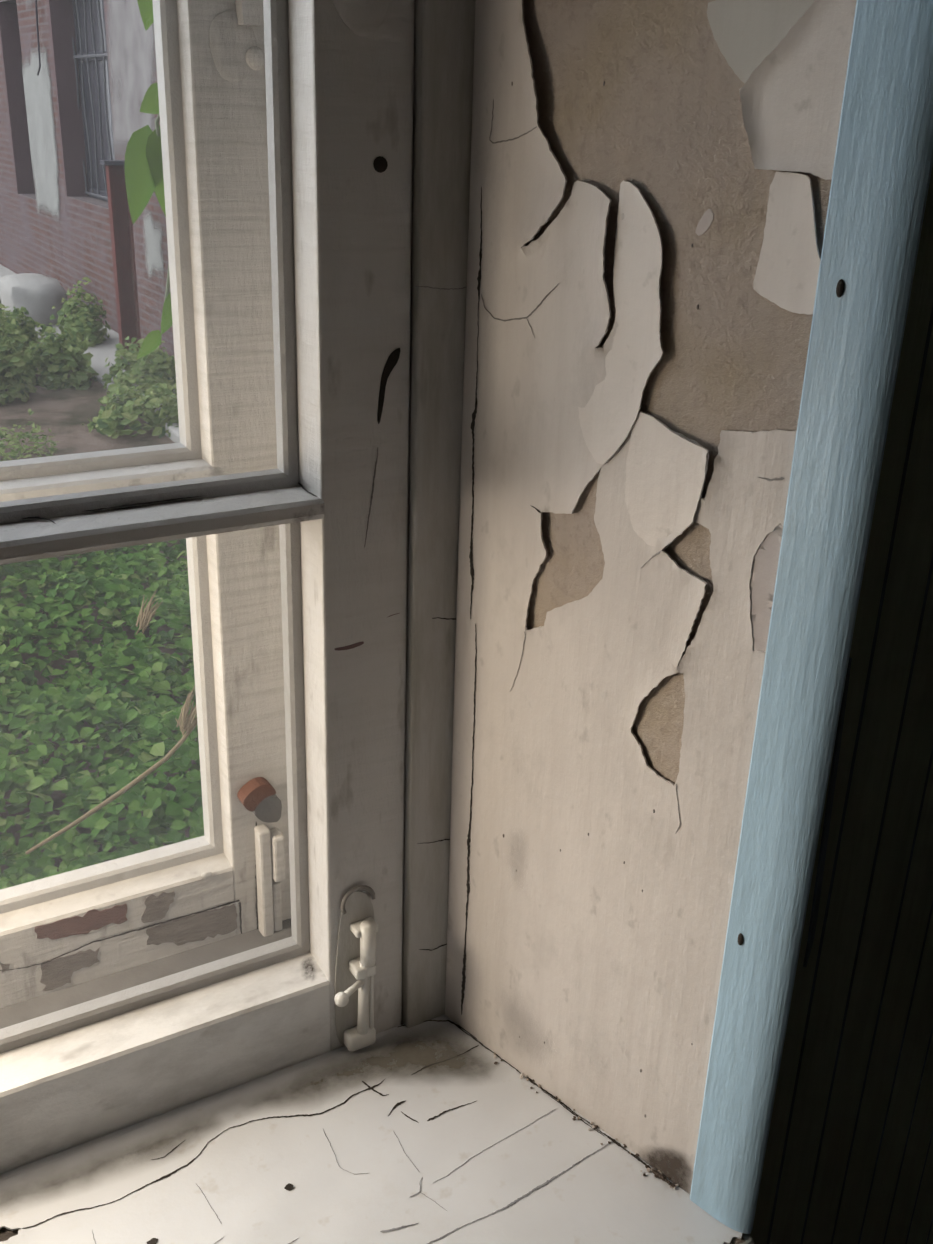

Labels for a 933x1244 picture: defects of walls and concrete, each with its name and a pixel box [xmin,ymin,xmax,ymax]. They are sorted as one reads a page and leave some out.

peeling [510,0,857,691]
crack [22,187,679,1244]
peeling [635,672,685,834]
peeling [0,856,258,991]
peeling [0,1230,18,1242]